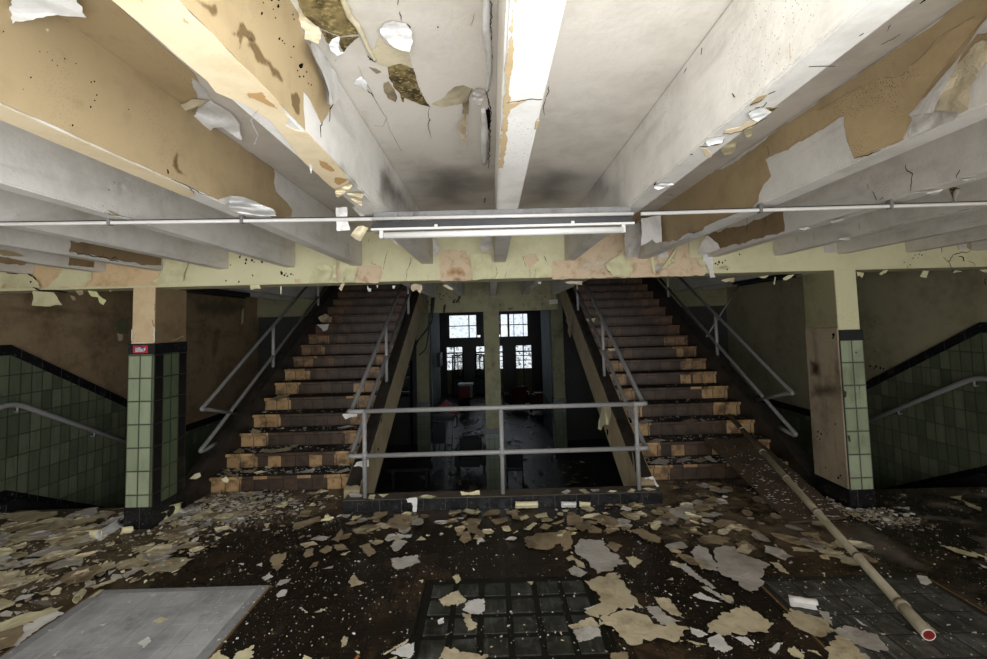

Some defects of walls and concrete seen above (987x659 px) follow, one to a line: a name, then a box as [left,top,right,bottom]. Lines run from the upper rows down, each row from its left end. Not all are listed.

water stain [237,24,282,80]
peeling [0,0,525,241]
peeling [0,240,188,307]
peeling [294,260,383,292]
peeling [433,236,492,290]